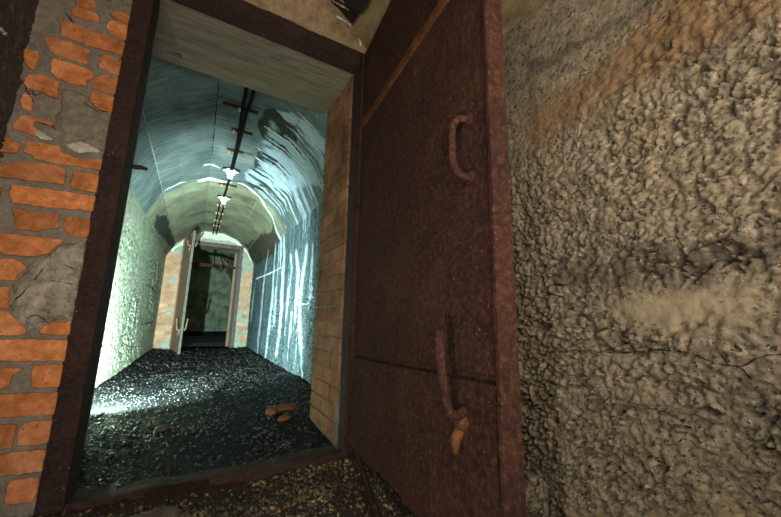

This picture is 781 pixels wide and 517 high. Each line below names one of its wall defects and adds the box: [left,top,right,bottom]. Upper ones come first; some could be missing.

leakage [330,0,371,26]